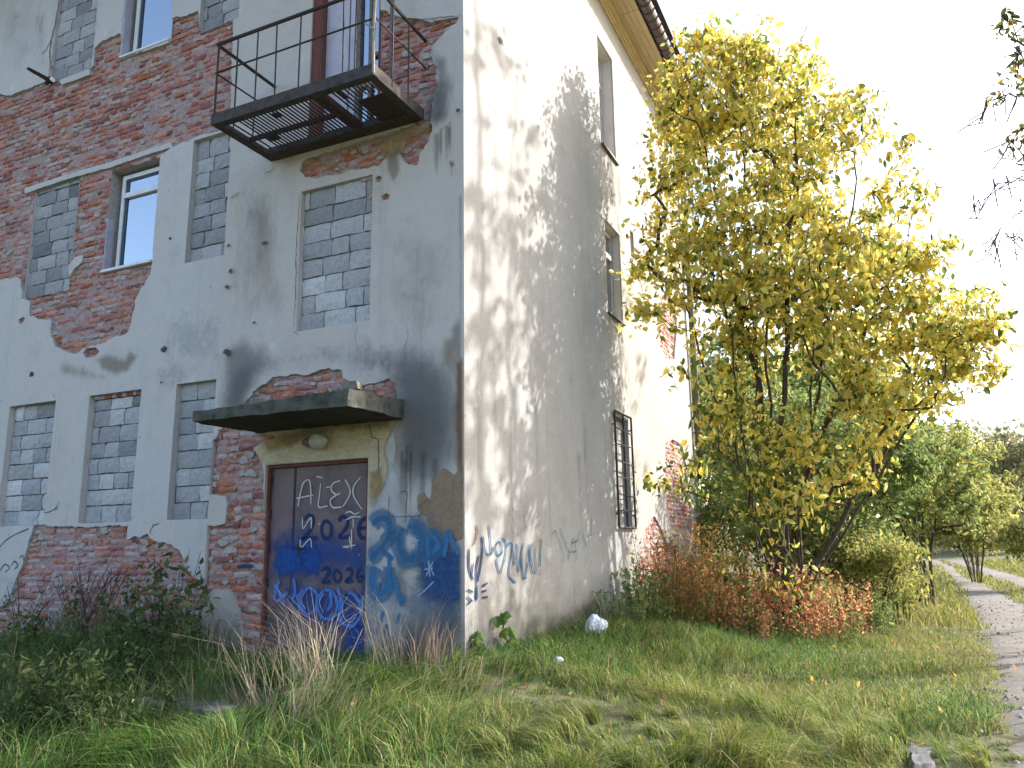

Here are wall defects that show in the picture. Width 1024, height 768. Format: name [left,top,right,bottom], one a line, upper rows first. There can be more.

flaking render [0,10,233,358]
flaking render [299,10,459,200]
flaking render [245,368,348,404]
flaking render [362,378,397,398]
flaking render [0,421,393,651]
flaking render [417,468,463,541]
flaking render [634,439,691,609]